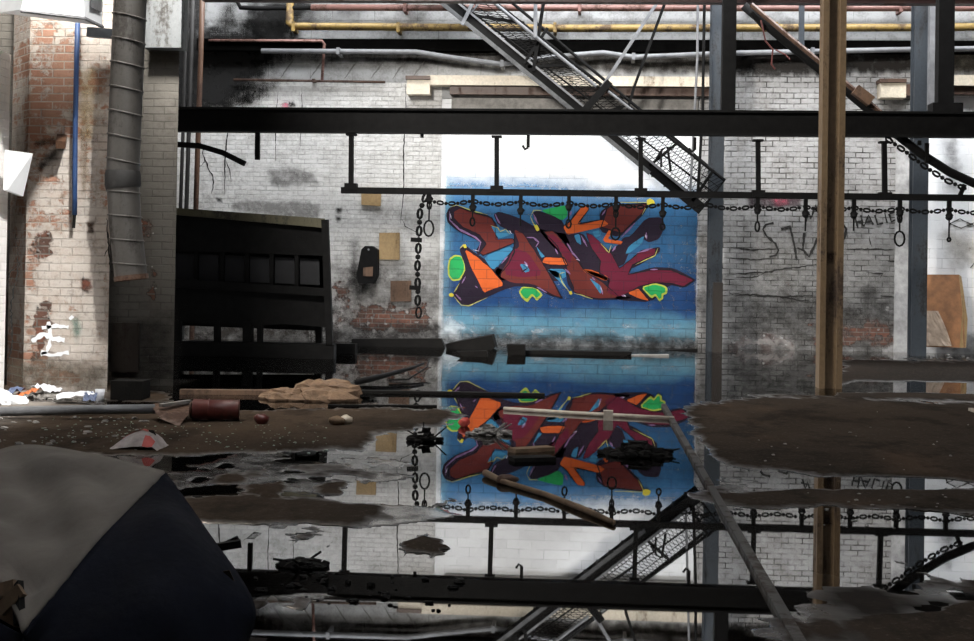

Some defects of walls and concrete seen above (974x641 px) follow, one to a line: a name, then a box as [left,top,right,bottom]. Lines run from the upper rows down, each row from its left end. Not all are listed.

flaking render [30,231,53,259]
spalling [81,277,92,293]
flaking render [332,277,432,331]
flaking render [31,301,53,361]
flaking render [843,318,894,347]